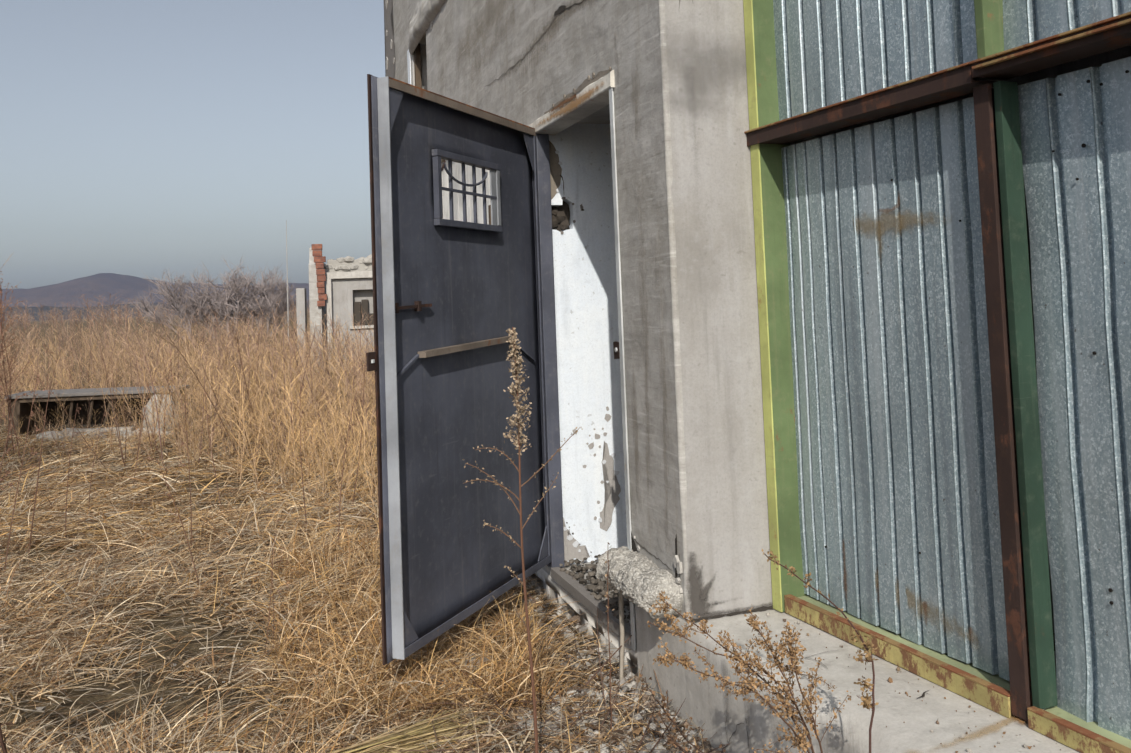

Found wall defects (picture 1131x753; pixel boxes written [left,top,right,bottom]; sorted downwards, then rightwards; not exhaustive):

crack [486,0,585,86]
spalling [544,67,612,114]
peeling [572,406,621,531]